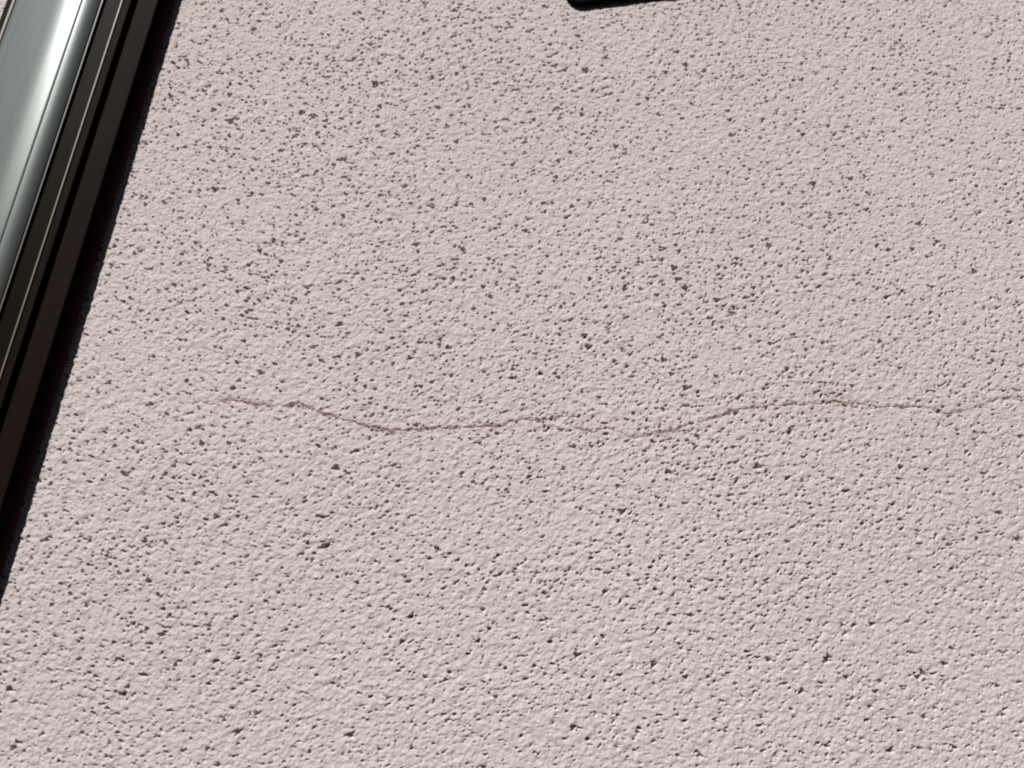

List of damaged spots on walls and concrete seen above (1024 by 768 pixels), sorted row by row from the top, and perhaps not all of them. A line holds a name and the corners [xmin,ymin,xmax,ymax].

crack [183,397,1023,438]